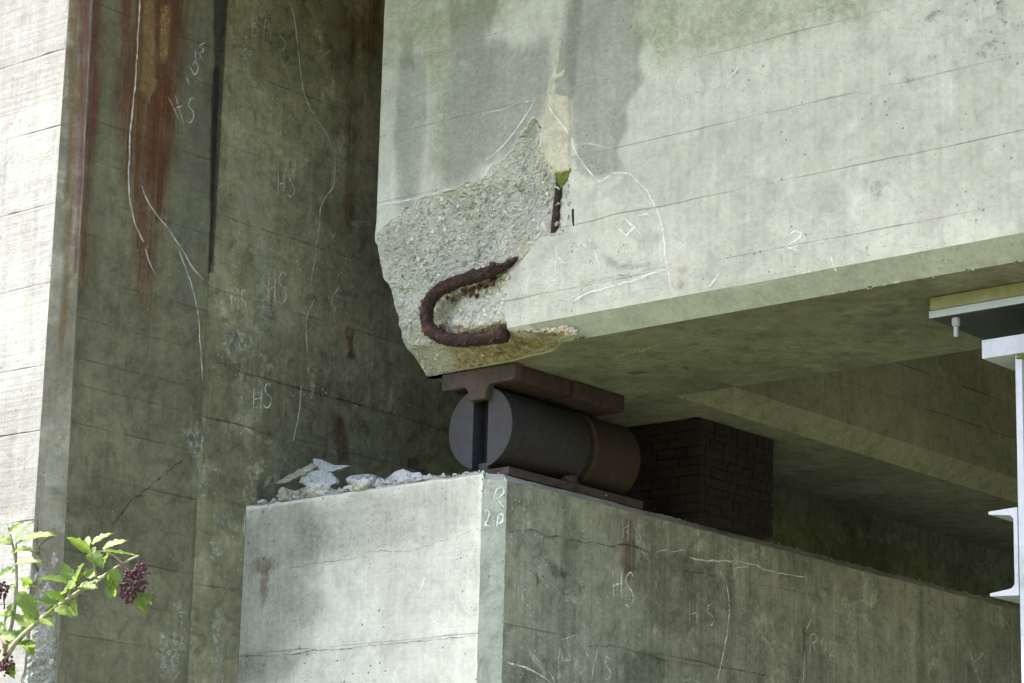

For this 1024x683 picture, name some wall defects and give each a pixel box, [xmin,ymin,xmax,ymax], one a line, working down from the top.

corrosion [122,0,170,276]
corrosion [419,256,517,338]
spalling [375,134,585,382]